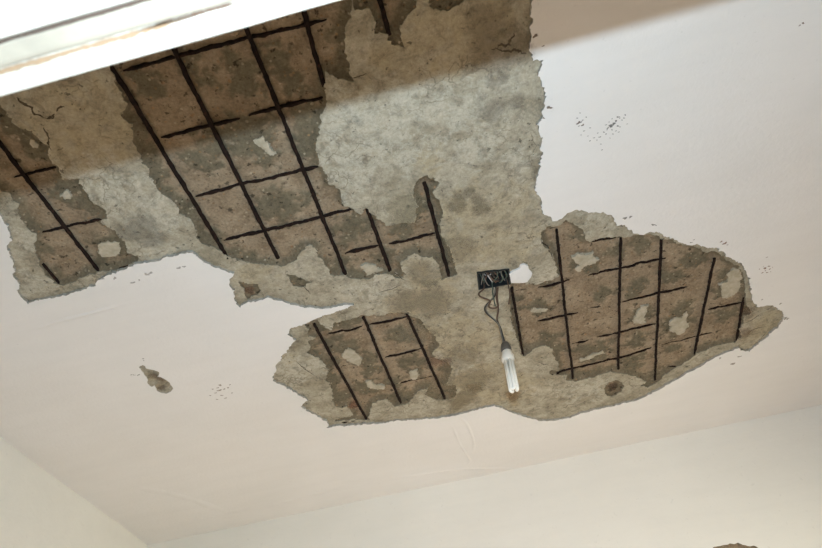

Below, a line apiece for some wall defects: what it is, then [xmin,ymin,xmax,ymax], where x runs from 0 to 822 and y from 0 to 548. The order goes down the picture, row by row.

rust [0,0,237,75]
crack [16,97,64,149]
flaking render [0,0,784,428]